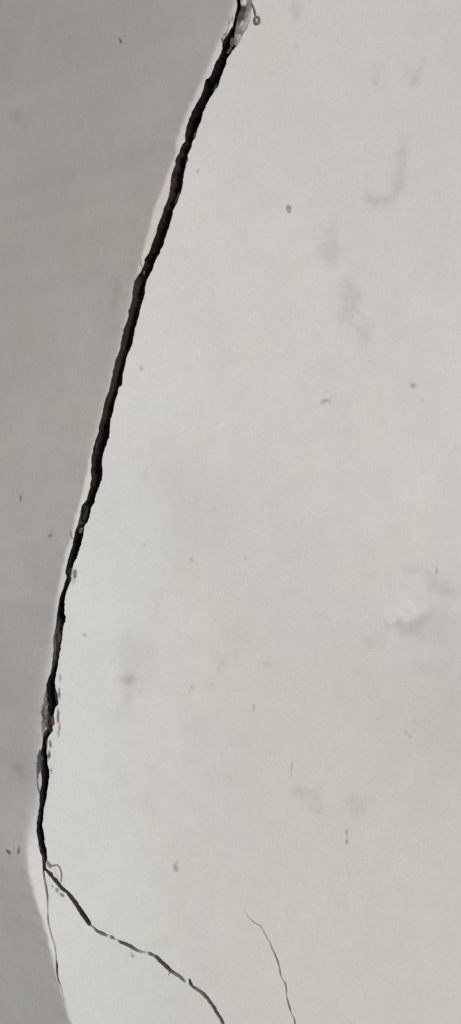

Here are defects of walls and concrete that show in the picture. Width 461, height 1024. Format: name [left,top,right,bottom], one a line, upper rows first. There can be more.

crack [36,0,241,1024]
crack [243,909,296,1024]